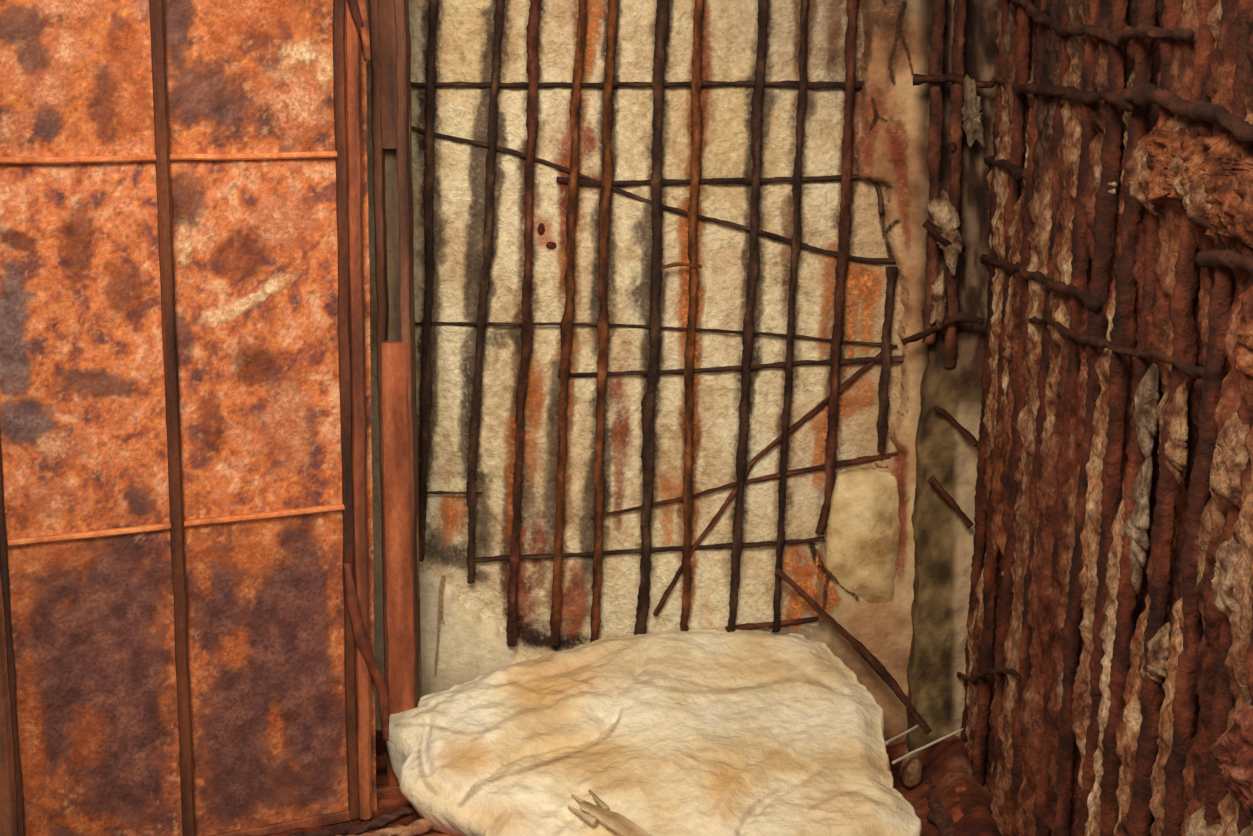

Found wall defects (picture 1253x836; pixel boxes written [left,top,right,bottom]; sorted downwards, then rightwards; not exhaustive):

rust [261,64,325,145]
rust [259,382,312,466]
spalling [366,61,382,554]
damp [424,103,521,581]
rust [441,0,712,650]
damp [591,202,614,327]
damp [631,203,653,319]
rust [774,351,839,629]
rust [794,0,910,486]
rust [893,447,907,570]
rust [18,651,117,836]
rust [287,804,433,836]